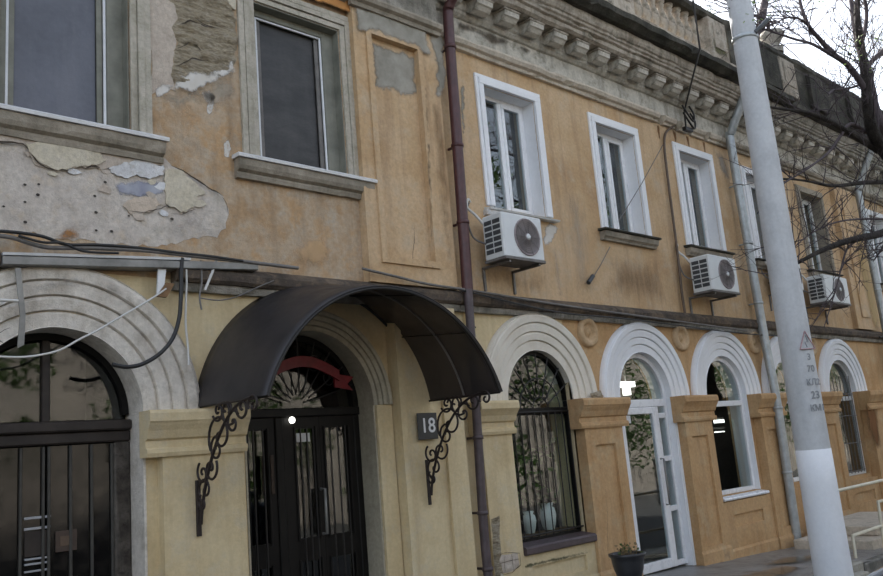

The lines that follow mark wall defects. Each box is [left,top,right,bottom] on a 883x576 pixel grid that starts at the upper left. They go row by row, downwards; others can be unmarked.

spalling [169,0,237,92]
peeling [357,8,446,96]
peeling [0,135,229,247]
spalling [491,515,521,576]